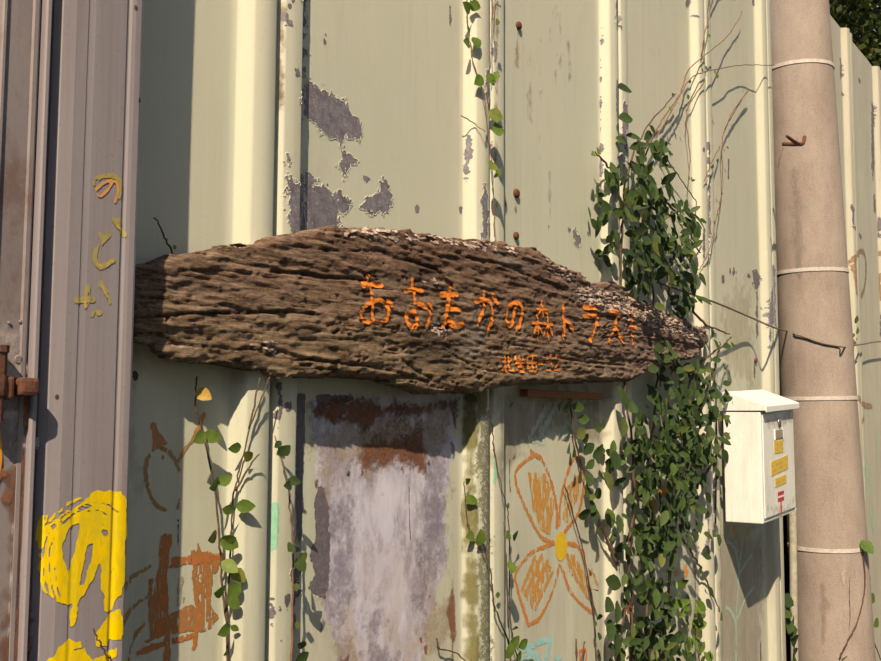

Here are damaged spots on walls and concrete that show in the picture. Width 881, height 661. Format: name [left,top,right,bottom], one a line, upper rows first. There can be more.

peeling [280,0,394,234]
peeling [269,382,459,661]
corrosion [313,394,460,477]